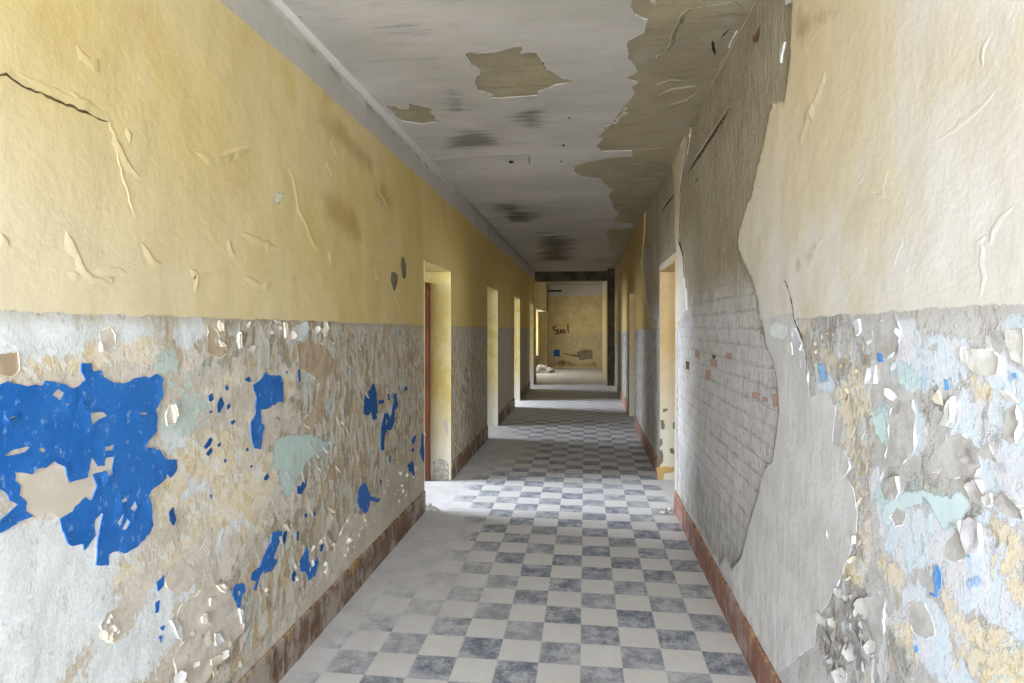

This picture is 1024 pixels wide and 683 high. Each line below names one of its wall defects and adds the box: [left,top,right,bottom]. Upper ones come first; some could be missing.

spalling [465,47,573,98]
crack [0,72,135,217]
peeling [0,350,21,378]
peeling [15,457,114,519]
peeling [165,404,179,426]
peeling [265,321,449,582]
flaking render [574,0,791,565]
crack [784,279,809,393]
peeling [800,319,918,527]
peeling [945,517,984,562]
peeling [927,390,1024,520]
peeling [815,532,886,683]